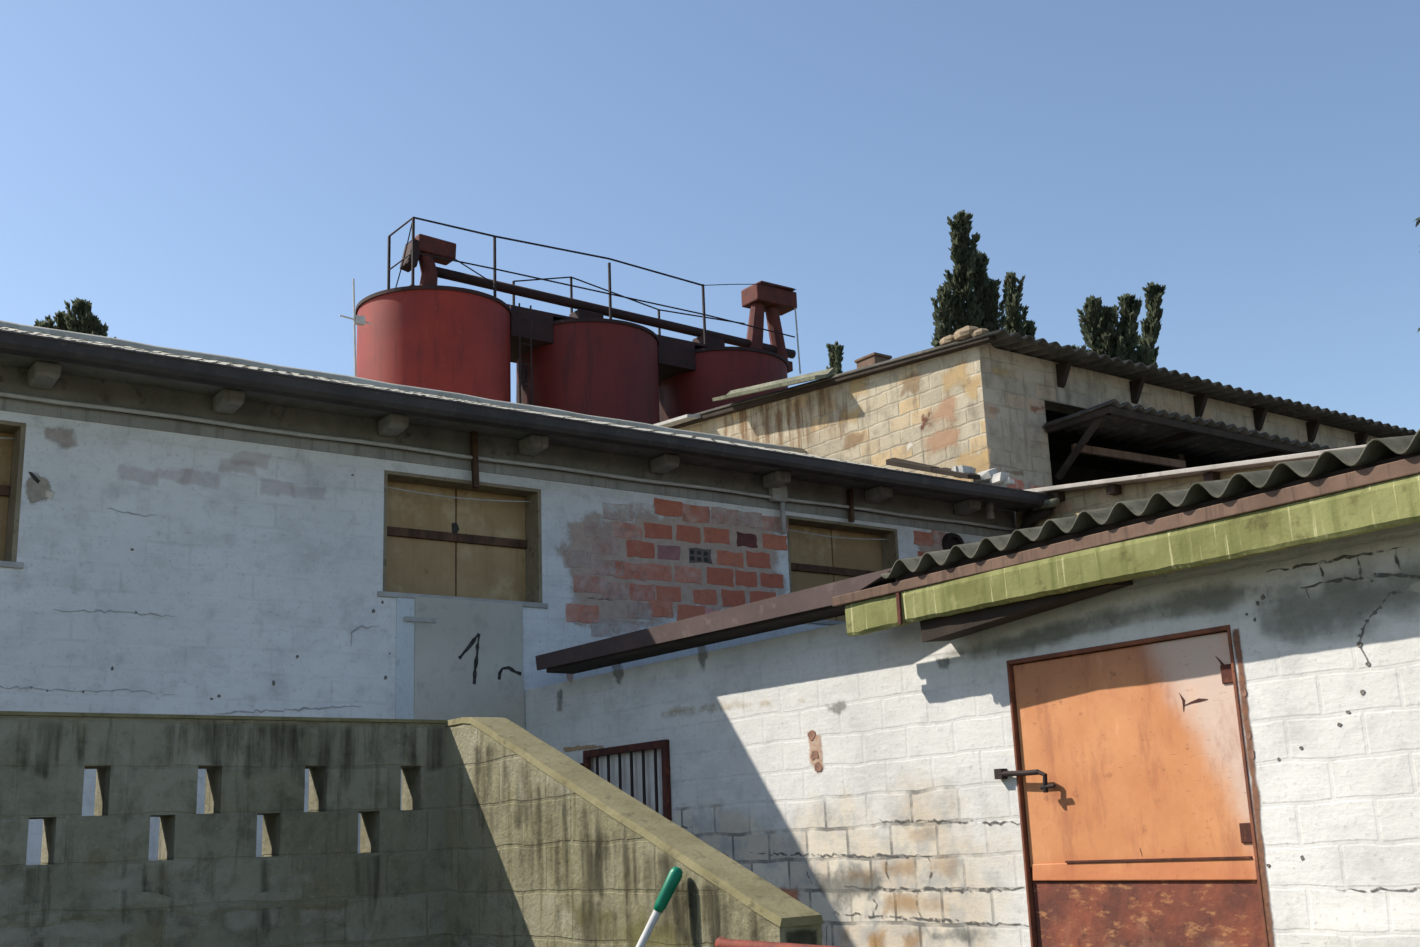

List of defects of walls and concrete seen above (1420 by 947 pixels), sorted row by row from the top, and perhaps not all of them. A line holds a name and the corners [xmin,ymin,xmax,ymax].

spalling [26,472,55,503]
peeling [913,530,947,557]
peeling [561,498,788,637]
crack [54,609,174,617]
crack [1266,546,1420,727]
crack [0,686,175,695]
crack [214,705,362,715]
spalling [807,730,823,772]
corrosion [1065,629,1274,947]
leakage [661,857,693,941]
leakage [821,871,878,904]
leakage [787,931,817,945]